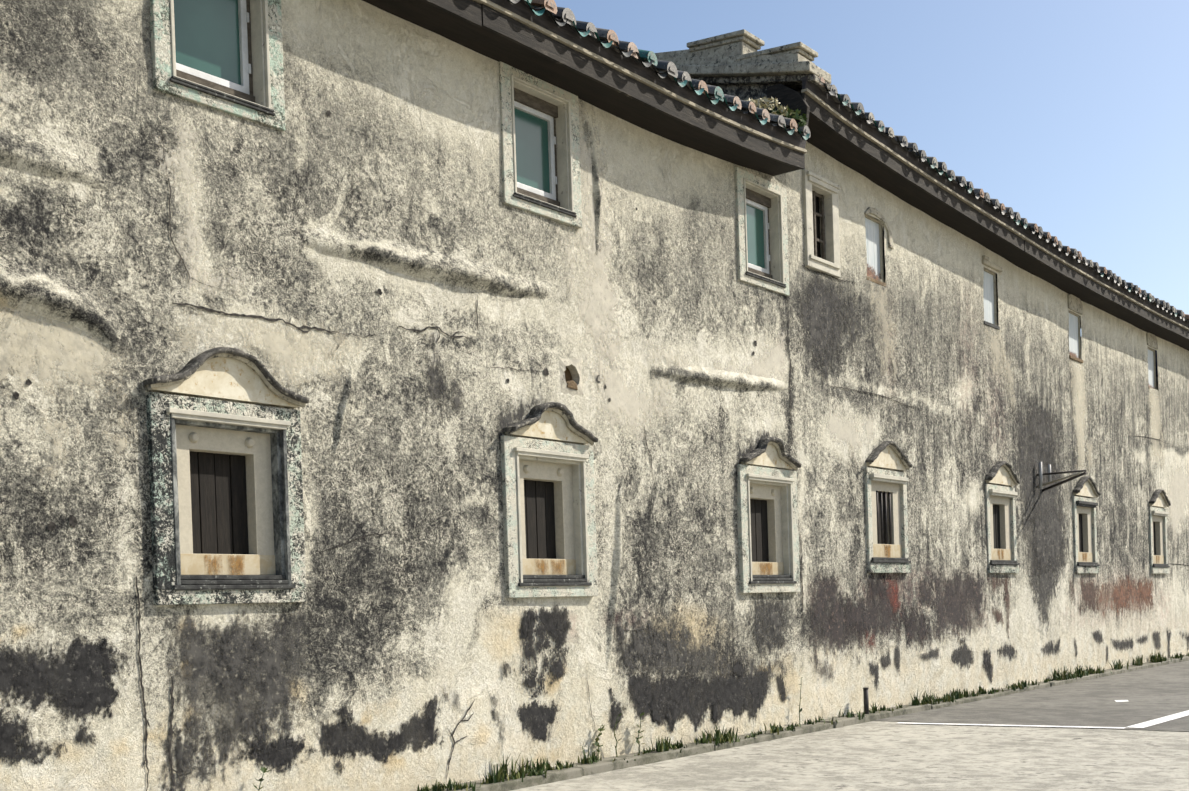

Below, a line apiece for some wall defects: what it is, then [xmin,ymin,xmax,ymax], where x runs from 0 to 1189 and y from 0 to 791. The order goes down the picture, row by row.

crack [161,131,480,351]
water stain [153,602,326,791]
water stain [606,592,792,695]
mould [805,563,987,686]
water stain [1014,396,1070,633]
corrosion [1094,572,1154,620]